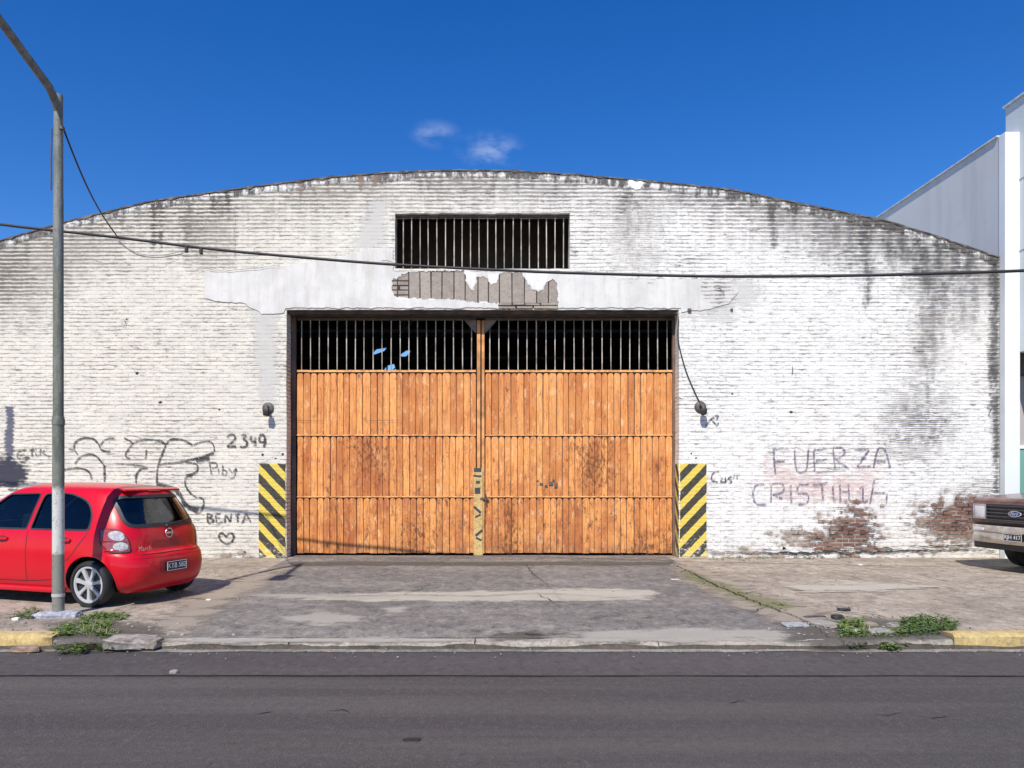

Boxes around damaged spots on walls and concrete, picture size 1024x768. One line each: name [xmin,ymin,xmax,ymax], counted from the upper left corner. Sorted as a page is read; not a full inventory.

flaking render [392,270,559,310]
water stain [663,183,1000,492]
peeling [707,475,1000,558]